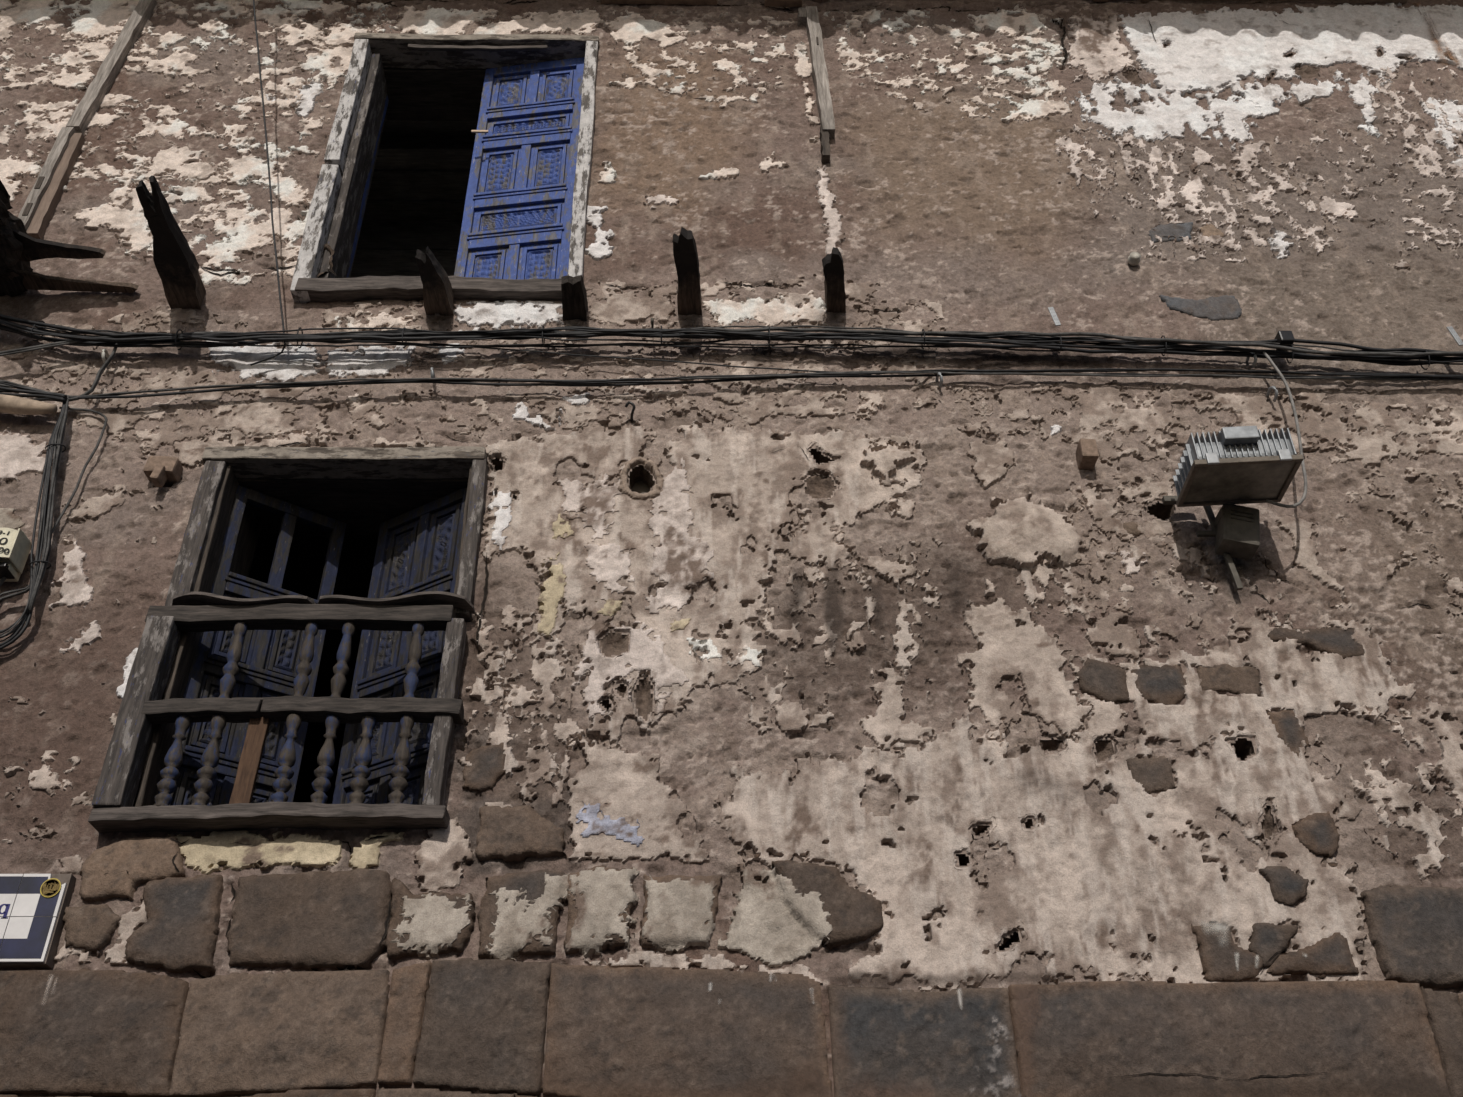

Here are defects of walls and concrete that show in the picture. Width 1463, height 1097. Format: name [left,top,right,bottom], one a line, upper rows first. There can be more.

flaking render [0,0,820,287]
flaking render [813,165,846,256]
flaking render [823,3,1463,270]
flaking render [0,273,1463,992]